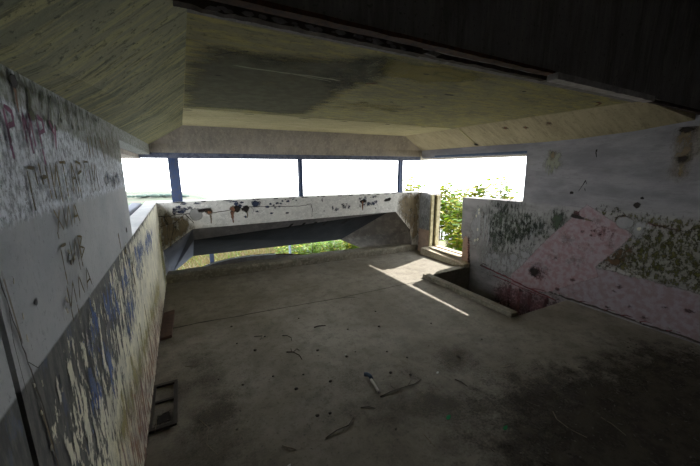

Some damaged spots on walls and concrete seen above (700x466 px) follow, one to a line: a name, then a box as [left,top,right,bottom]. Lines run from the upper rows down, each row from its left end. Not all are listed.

damp [184,47,482,114]
damp [492,280,559,315]
peeling [52,204,167,466]